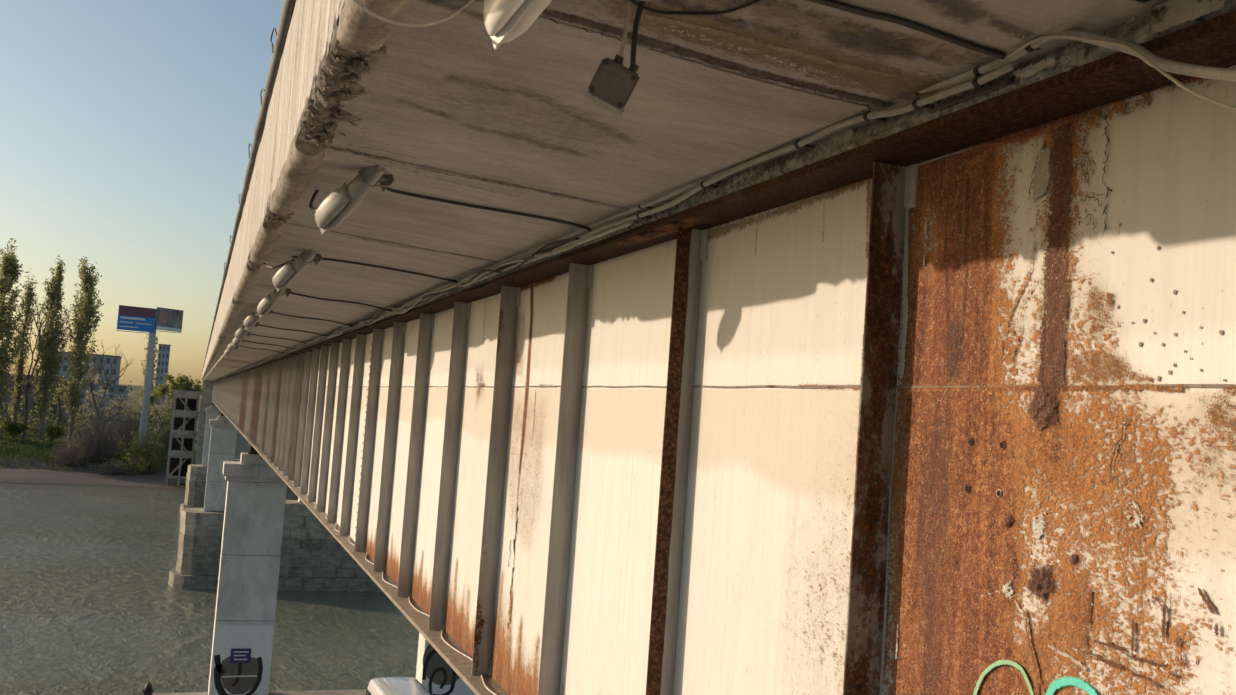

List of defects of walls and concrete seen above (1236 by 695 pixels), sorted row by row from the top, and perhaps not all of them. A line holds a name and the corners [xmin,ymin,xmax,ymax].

spalling [296,3,387,146]
water stain [610,0,1096,114]
water stain [616,125,869,226]
crack [1028,111,1112,239]
rust [880,77,1236,695]
rust [366,534,432,615]
rust [444,561,475,659]
rust [490,570,539,695]